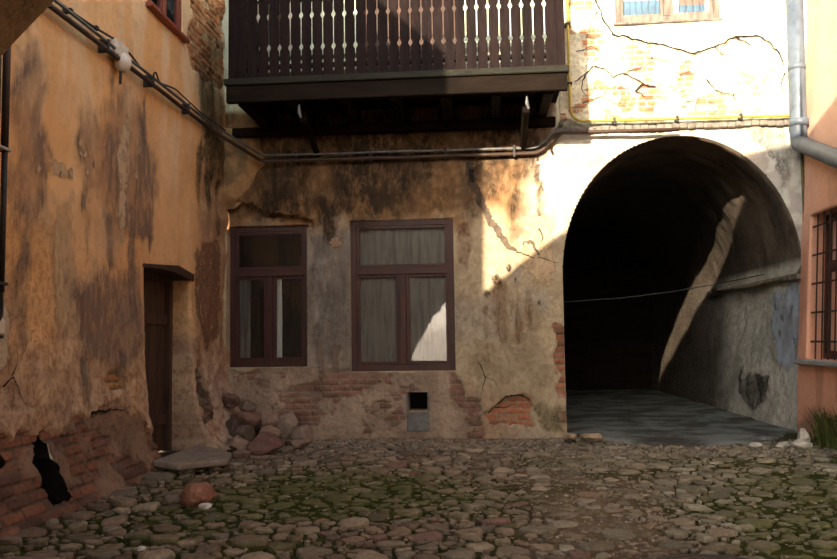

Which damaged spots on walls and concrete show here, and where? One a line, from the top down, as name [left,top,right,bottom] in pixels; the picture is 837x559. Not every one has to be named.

flaking render [186,0,226,90]
flaking render [560,0,788,122]
crack [575,0,786,106]
leakage [33,103,47,203]
leakage [54,101,156,395]
crack [465,161,558,263]
flaking render [0,366,167,538]
flaking render [228,366,534,440]